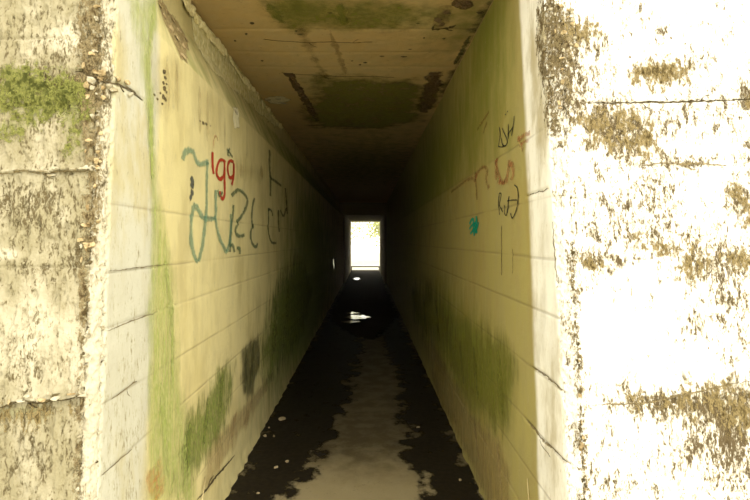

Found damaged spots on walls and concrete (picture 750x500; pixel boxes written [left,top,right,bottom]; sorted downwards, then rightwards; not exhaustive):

spalling [284,73,320,121]
spalling [417,72,443,113]
spalling [535,0,579,150]
crack [593,94,747,110]
crack [0,167,85,179]
crack [0,392,75,408]
damp [225,270,484,500]